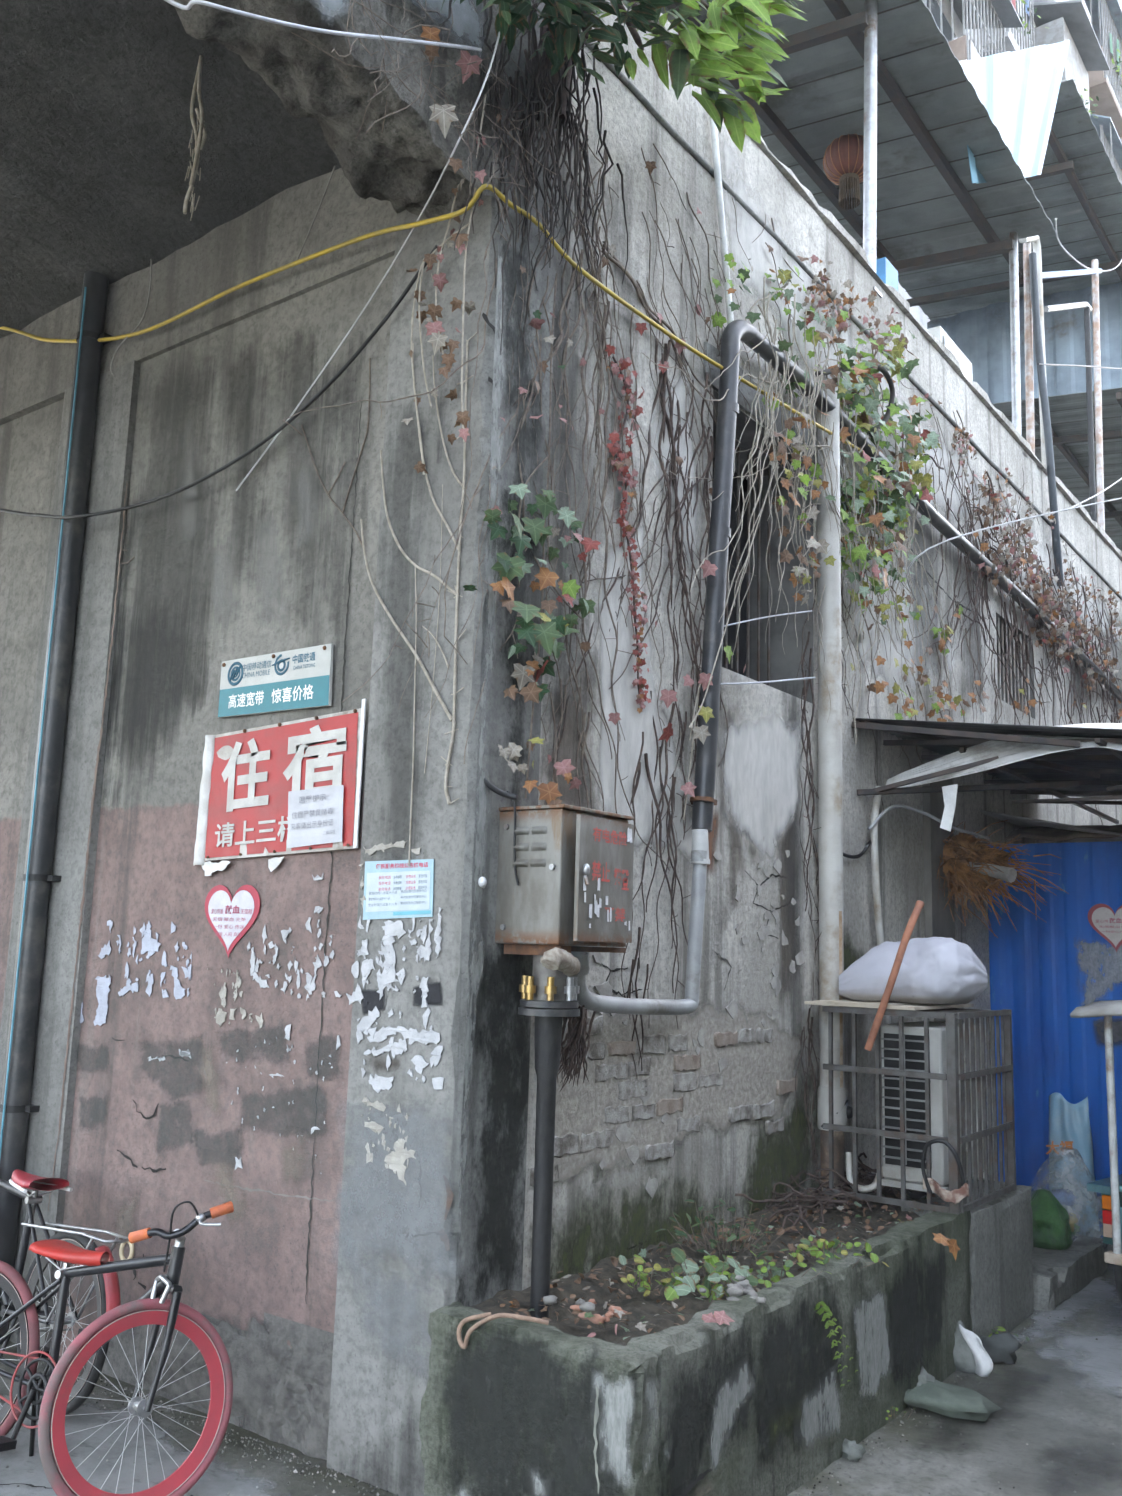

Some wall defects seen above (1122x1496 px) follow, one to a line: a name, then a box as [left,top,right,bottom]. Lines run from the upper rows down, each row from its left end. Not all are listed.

crack [341,404,362,712]
peeling [600,528,692,856]
peeling [652,372,697,568]
crack [204,851,333,1304]
spalling [553,715,805,1199]